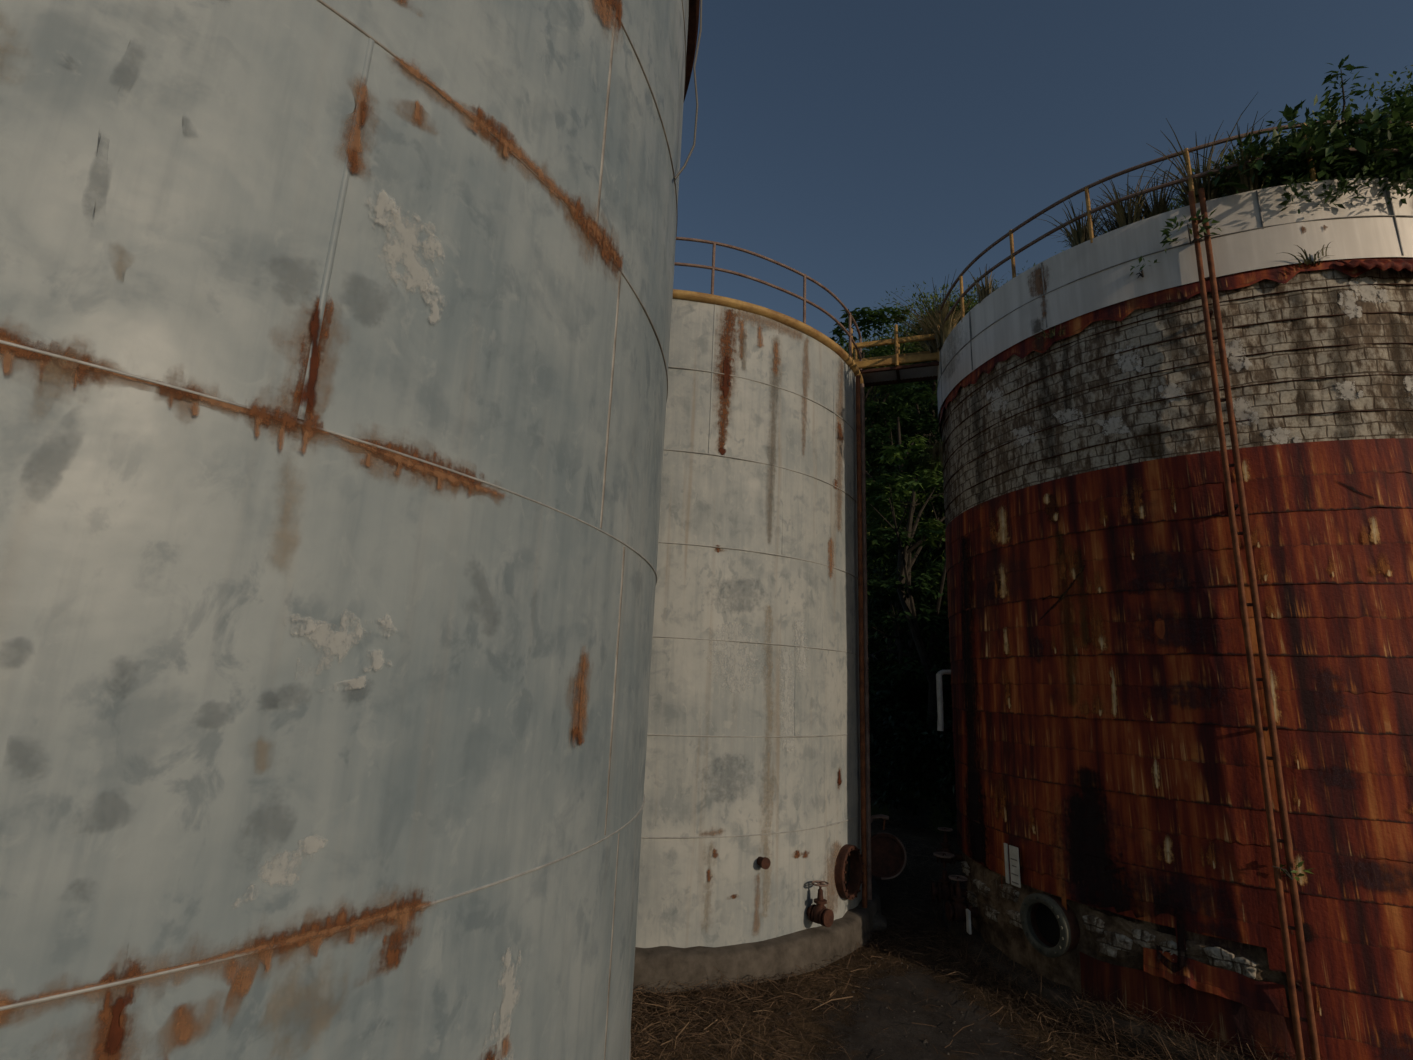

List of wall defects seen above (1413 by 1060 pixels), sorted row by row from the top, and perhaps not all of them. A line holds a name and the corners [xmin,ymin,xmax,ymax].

rust [347,83,367,173]
rust [395,58,622,270]
peeling [375,191,445,322]
rust [0,298,504,499]
rust [717,310,808,455]
rust [828,365,844,577]
leakage [1329,290,1354,437]
peeling [293,615,362,663]
rust [0,893,429,1060]
peeling [1082,915,1257,979]